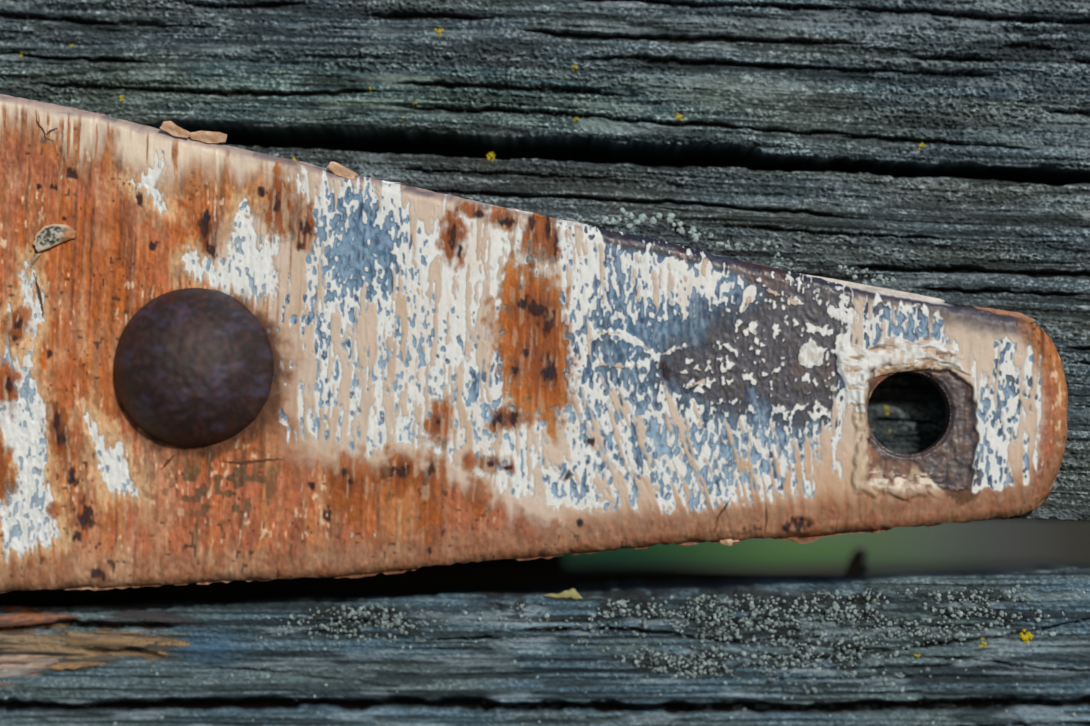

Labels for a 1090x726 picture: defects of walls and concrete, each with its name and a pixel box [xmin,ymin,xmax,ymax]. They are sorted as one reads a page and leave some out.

rust [0,107,1068,593]
peeling [181,162,1043,515]
rust [3,606,74,628]